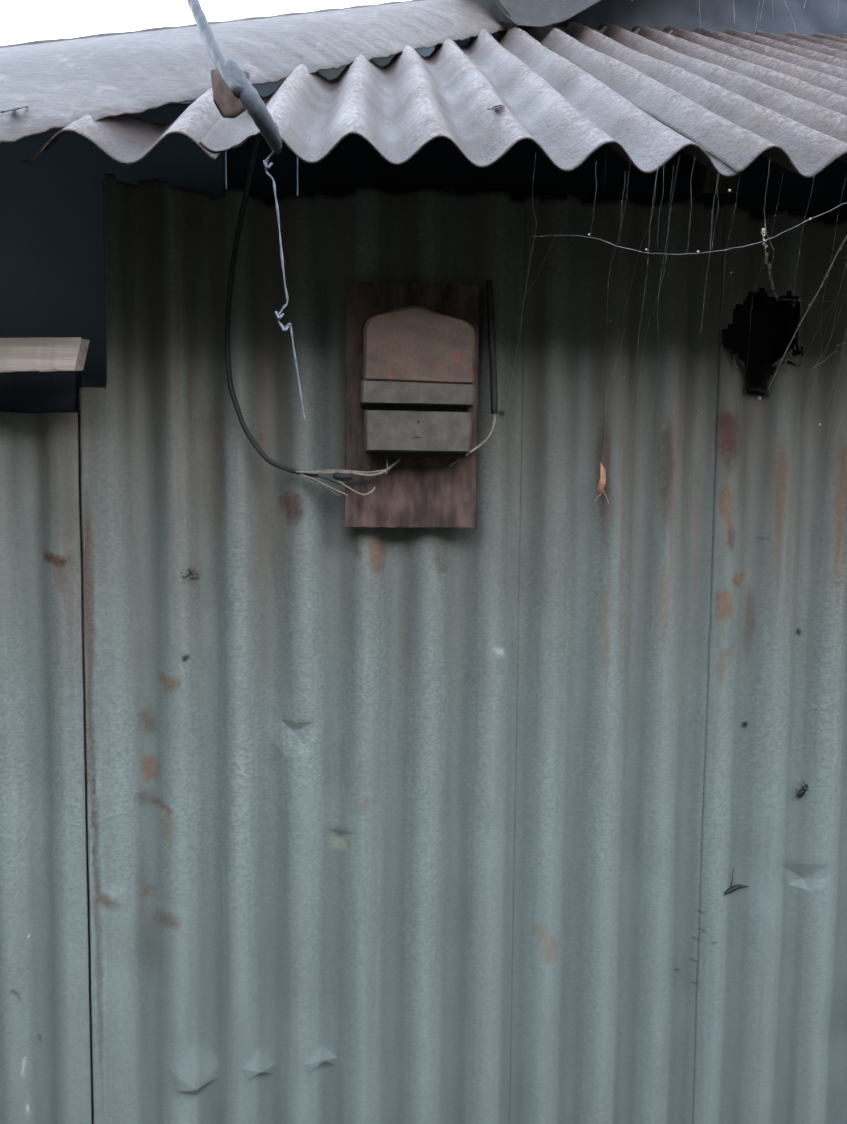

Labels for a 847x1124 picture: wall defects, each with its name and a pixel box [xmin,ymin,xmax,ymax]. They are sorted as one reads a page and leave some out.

spalling [722,291,801,391]